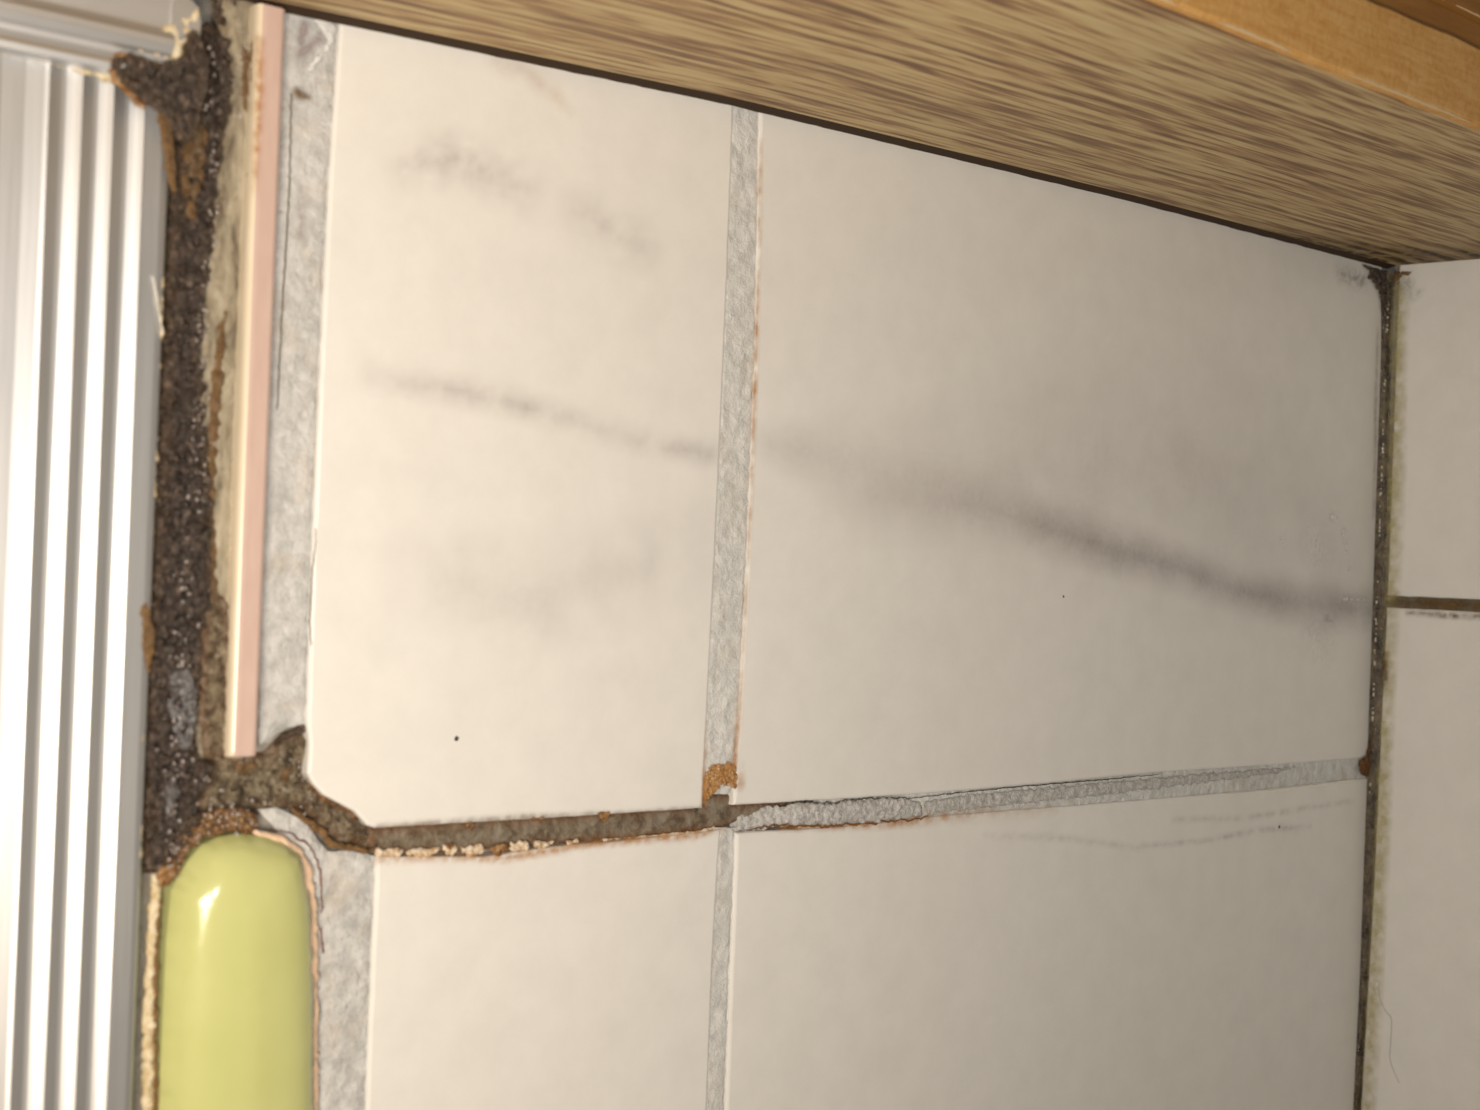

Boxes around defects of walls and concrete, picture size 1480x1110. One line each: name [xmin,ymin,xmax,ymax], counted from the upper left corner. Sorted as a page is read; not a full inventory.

corrosion [241,43,261,128]
corrosion [703,726,739,800]
corrosion [156,789,266,887]
corrosion [490,843,511,857]